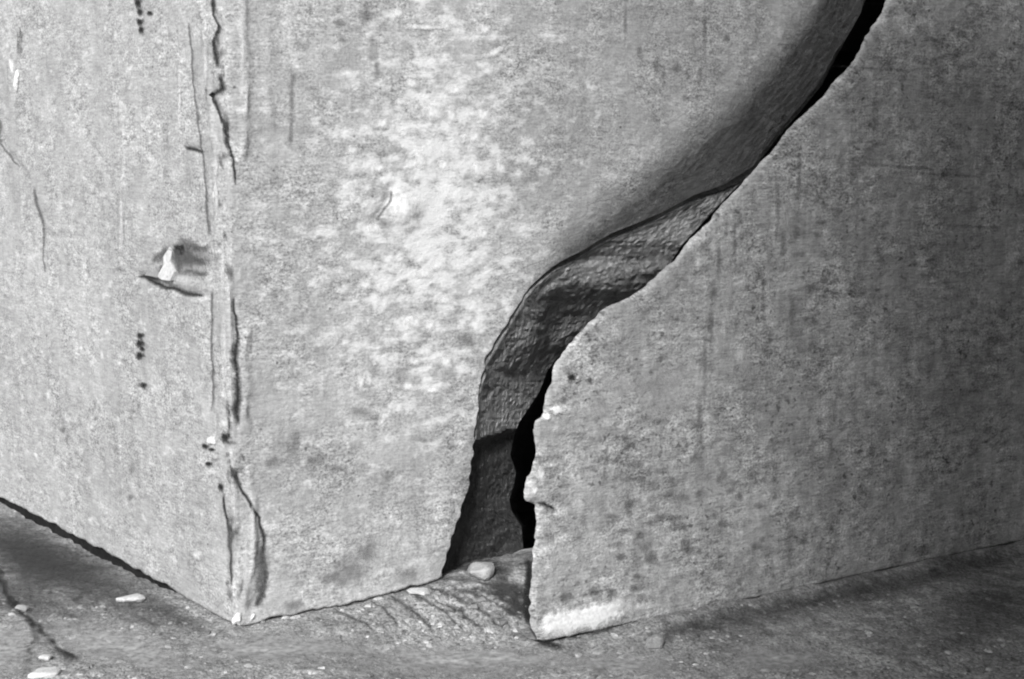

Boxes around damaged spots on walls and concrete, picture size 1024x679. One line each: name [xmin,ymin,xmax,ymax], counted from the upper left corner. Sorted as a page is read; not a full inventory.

crack [185,0,236,231]
spalling [139,241,206,296]
crack [211,294,241,423]
crack [441,0,886,648]
crack [222,468,267,606]